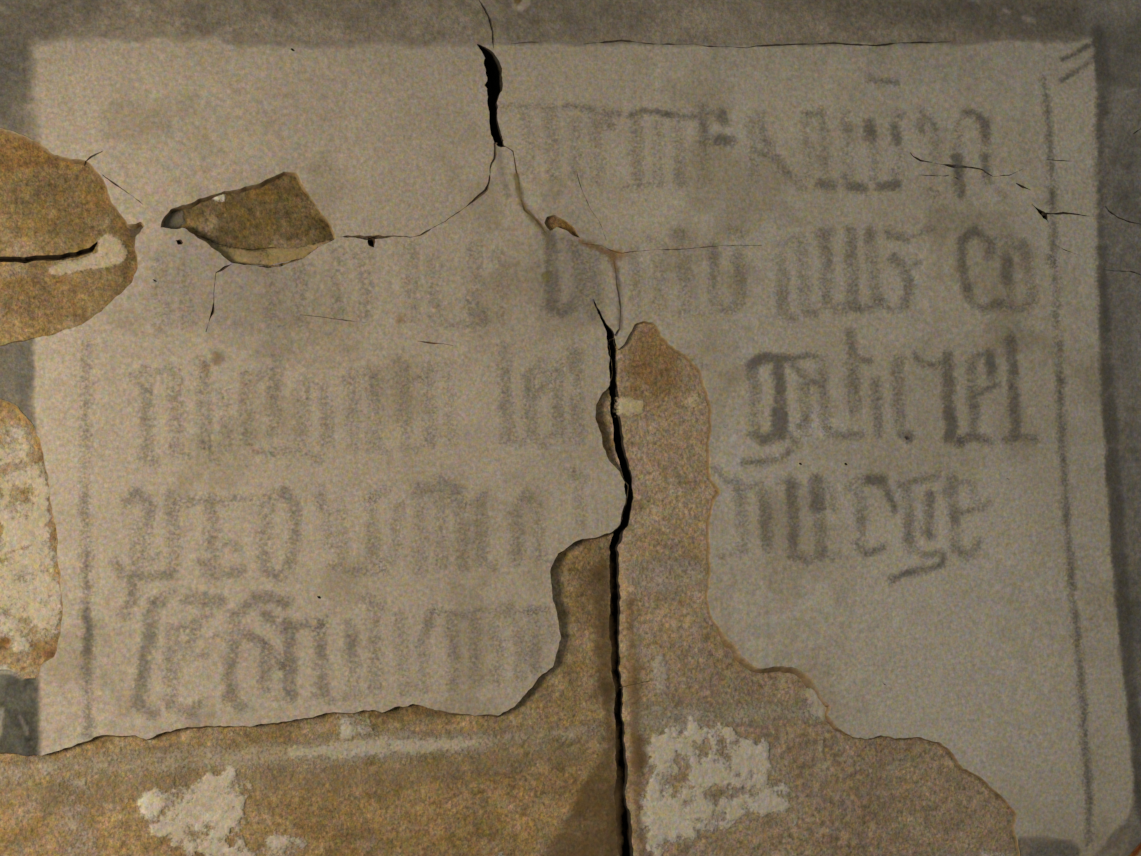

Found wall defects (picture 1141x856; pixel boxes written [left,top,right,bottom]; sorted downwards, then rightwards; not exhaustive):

flaking render [0,128,144,346]
crack [84,151,142,204]
flaking render [161,171,336,268]
crack [343,2,547,247]
crack [586,40,938,48]
flaking render [0,321,1020,856]